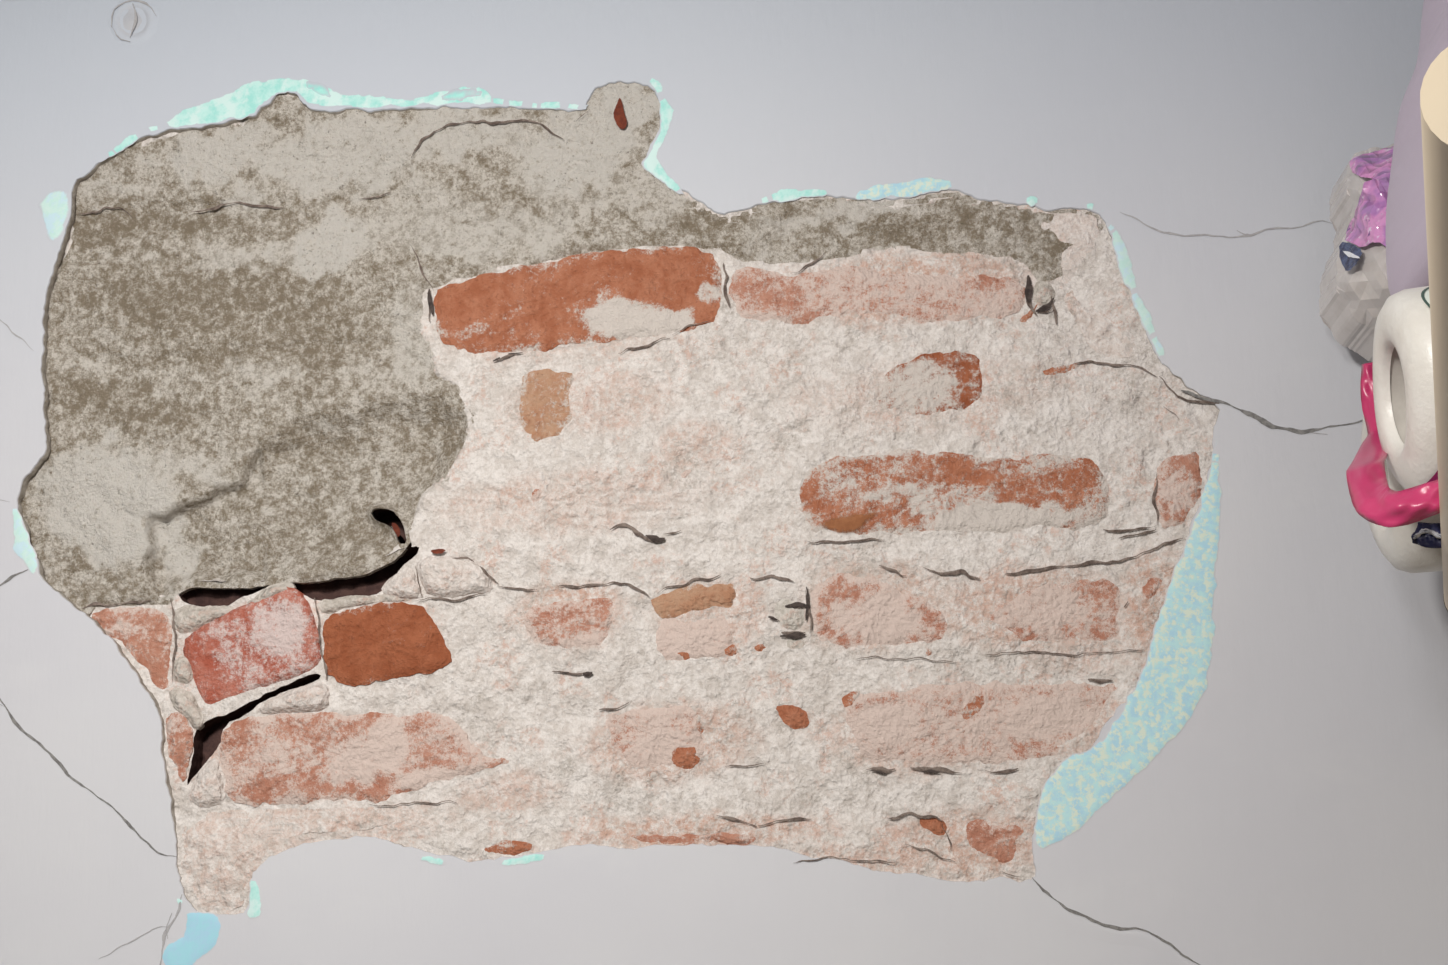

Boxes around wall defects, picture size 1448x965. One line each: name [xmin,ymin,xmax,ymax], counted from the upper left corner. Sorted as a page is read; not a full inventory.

crack [1120,212,1330,238]
crack [1181,390,1363,434]
spalling [11,77,1223,965]
crack [0,569,28,586]
crack [0,699,176,857]
crack [99,895,182,965]
crack [1018,877,1200,965]